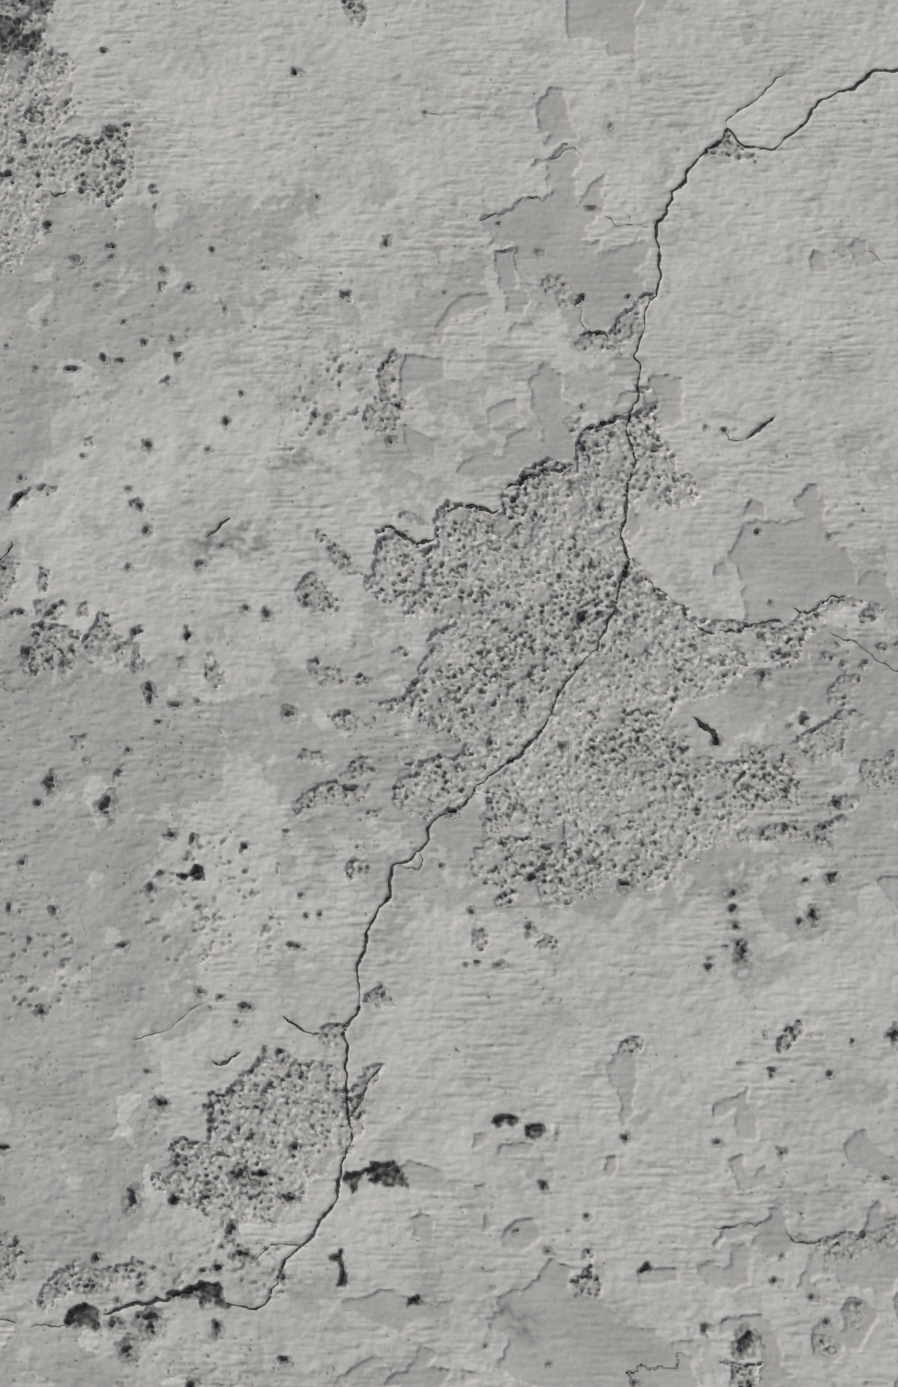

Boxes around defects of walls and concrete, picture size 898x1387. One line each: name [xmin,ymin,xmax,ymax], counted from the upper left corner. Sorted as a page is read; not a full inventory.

spalling [0,0,162,275]
spalling [7,474,59,511]
spalling [0,542,227,724]
crack [103,68,898,1315]
spalling [115,361,898,974]
spalling [32,768,62,808]
spalling [92,746,132,825]
spalling [0,889,95,1039]
spalling [763,1020,805,1080]
spalling [883,1021,898,1051]
spalling [36,1023,794,1387]
crack [0,1318,65,1327]